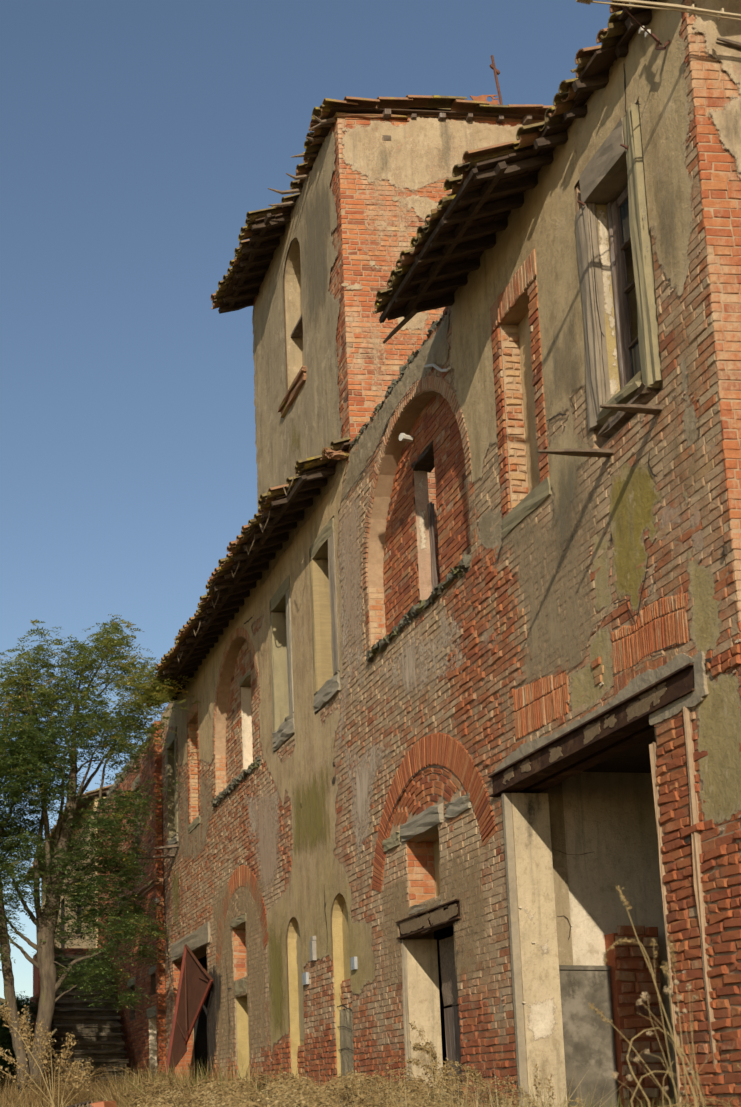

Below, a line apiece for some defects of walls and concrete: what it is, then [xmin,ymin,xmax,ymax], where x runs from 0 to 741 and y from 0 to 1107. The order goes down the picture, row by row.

flaking render [302,956,337,1093]
flaking render [321,133,741,1107]